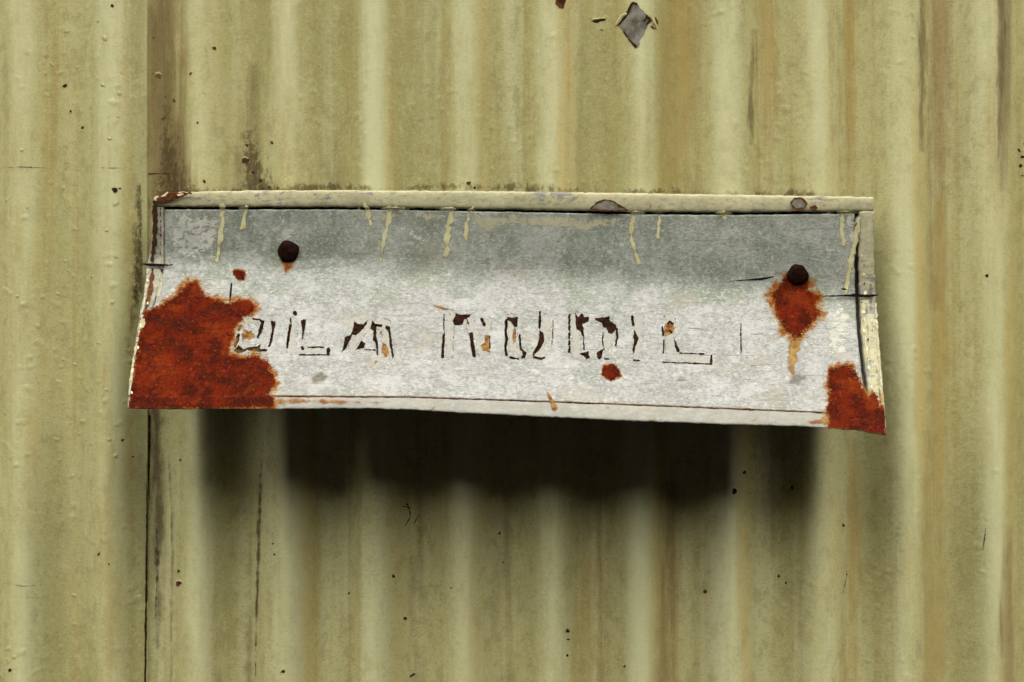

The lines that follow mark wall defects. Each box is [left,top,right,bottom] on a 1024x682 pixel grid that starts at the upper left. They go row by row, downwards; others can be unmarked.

peeling [592,2,658,48]
corrosion [765,272,827,375]
corrosion [601,363,621,381]
corrosion [810,361,886,436]
corrosion [128,278,360,682]